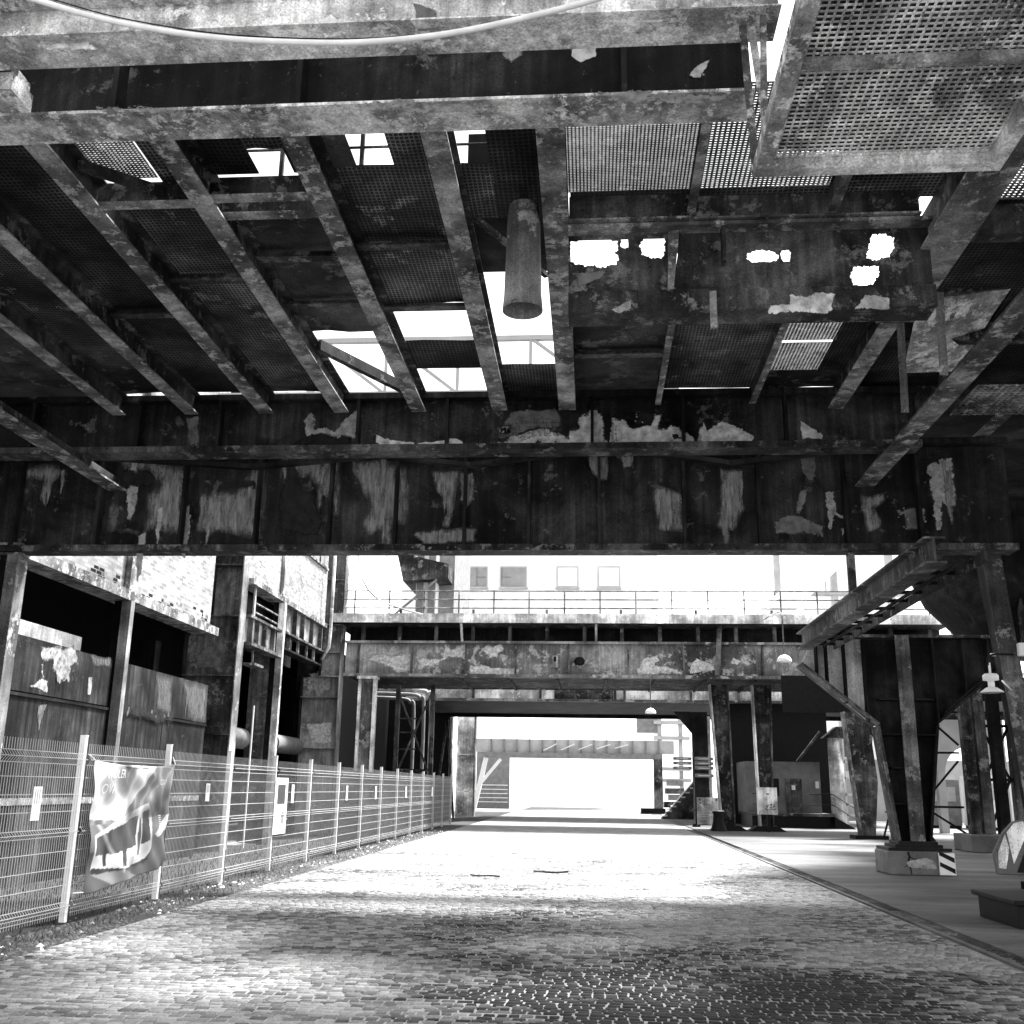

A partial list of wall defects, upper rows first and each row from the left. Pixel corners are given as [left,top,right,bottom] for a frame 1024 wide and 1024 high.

peeling [304,411,357,439]
peeling [497,409,561,439]
peeling [459,473,474,506]
peeling [354,459,408,556]
peeling [31,646,78,693]
peeling [365,644,519,674]